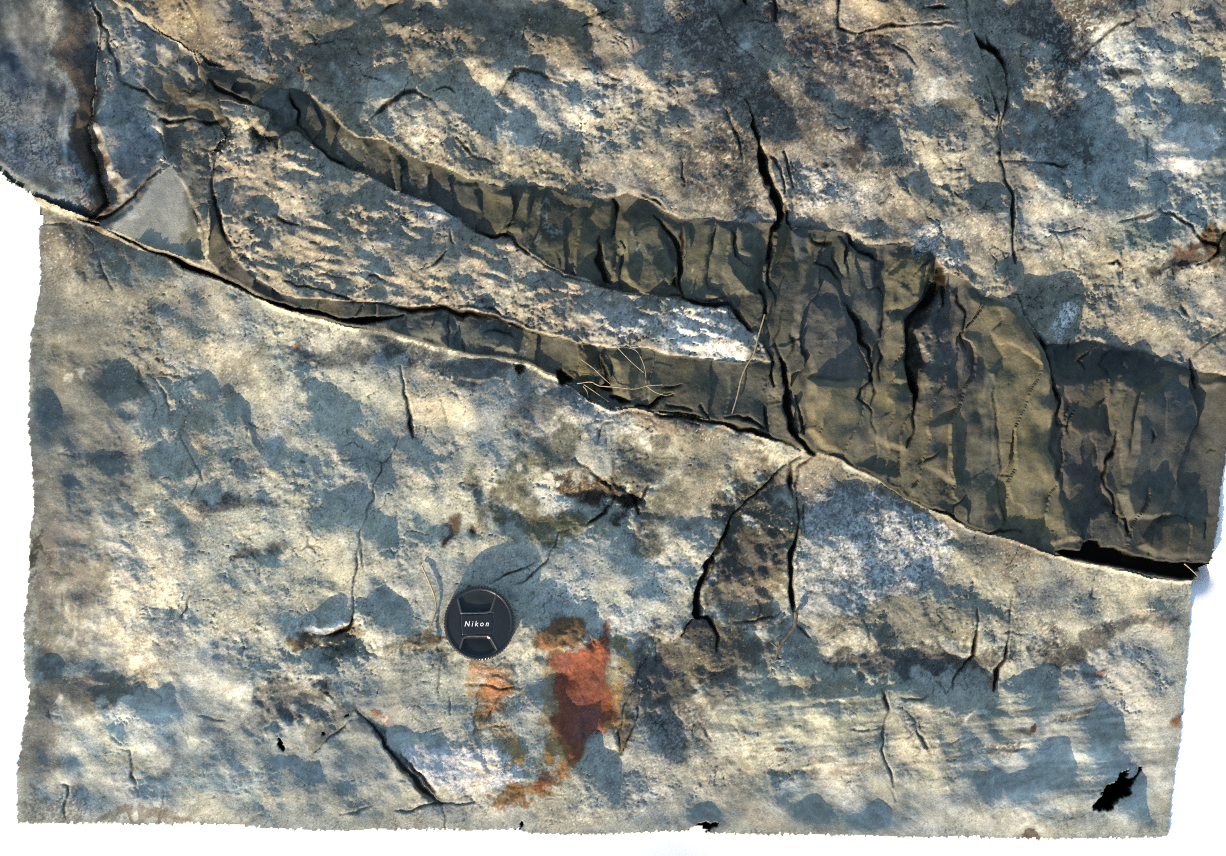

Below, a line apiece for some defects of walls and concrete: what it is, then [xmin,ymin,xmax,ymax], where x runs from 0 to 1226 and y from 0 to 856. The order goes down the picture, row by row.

crack [837,0,946,34]
crack [974,34,1008,119]
crack [451,198,618,288]
crack [998,149,1016,262]
crack [598,116,966,492]
crack [692,514,798,648]
crack [333,720,438,809]
rust [472,663,524,764]
rust [489,623,634,811]